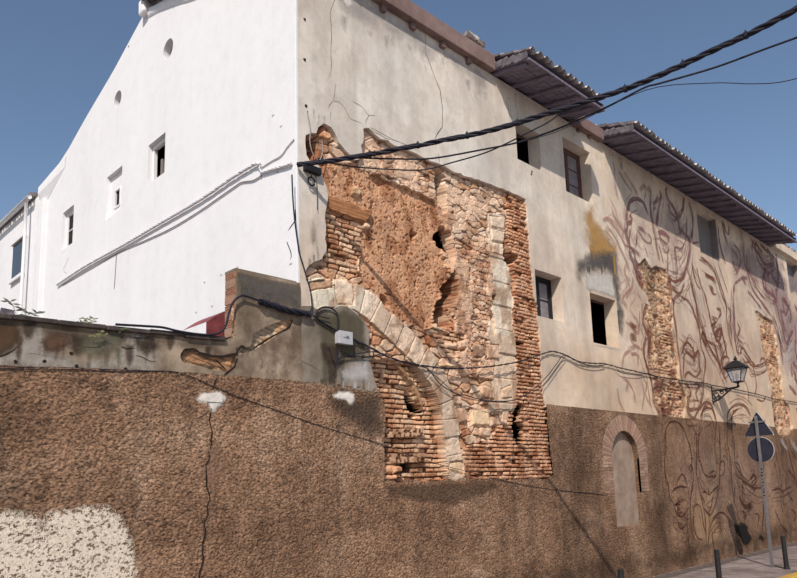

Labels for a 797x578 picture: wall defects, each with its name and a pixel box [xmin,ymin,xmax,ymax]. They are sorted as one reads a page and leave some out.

crack [329,0,406,145]
crack [425,38,443,163]
damp [0,323,69,367]
damp [73,334,155,370]
flaking render [180,320,291,372]
crack [182,319,293,388]
flaking render [305,126,553,483]
damp [586,212,616,297]
flaking render [637,259,685,418]
flaking render [755,311,791,437]
crack [198,408,213,578]